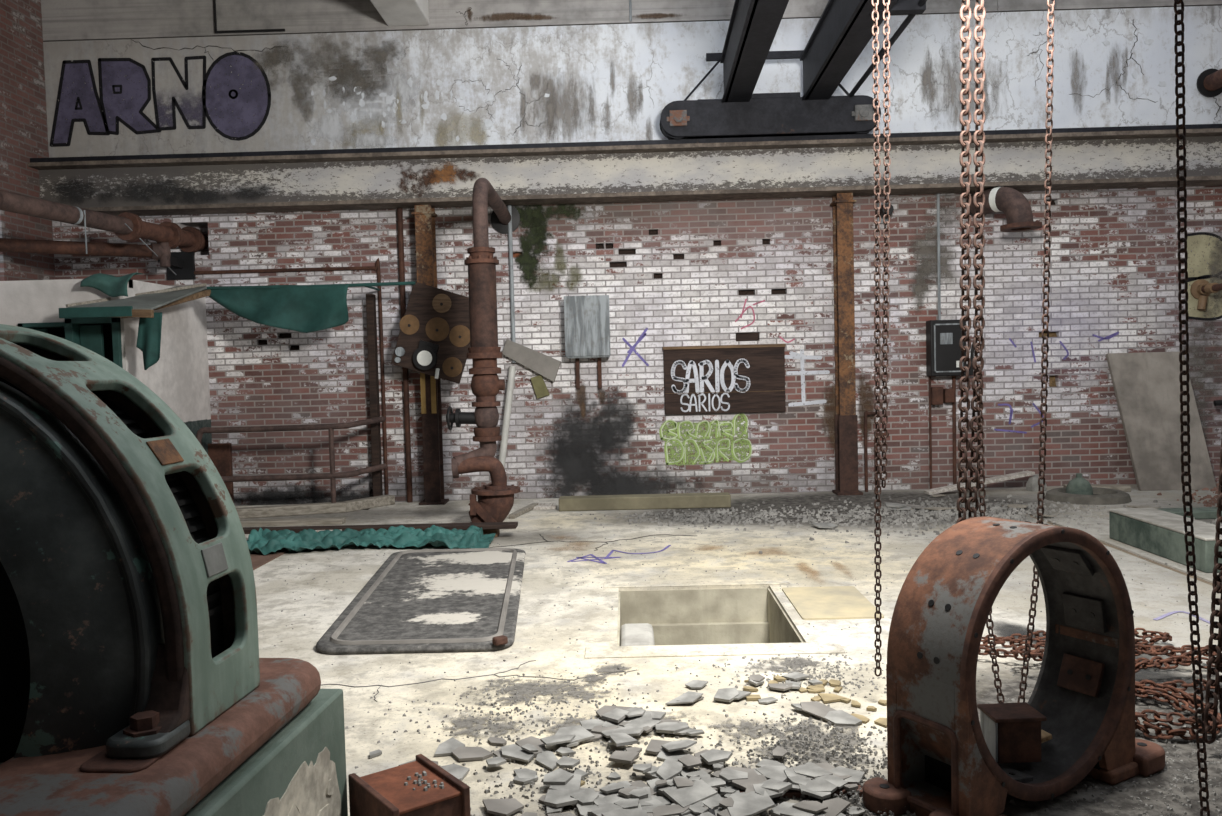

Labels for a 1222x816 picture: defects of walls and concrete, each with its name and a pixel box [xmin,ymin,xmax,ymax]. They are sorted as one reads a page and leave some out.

damp [256,44,417,146]
damp [521,64,643,135]
damp [922,49,995,115]
damp [1071,53,1081,106]
damp [1106,51,1127,94]
corrosion [399,163,477,197]